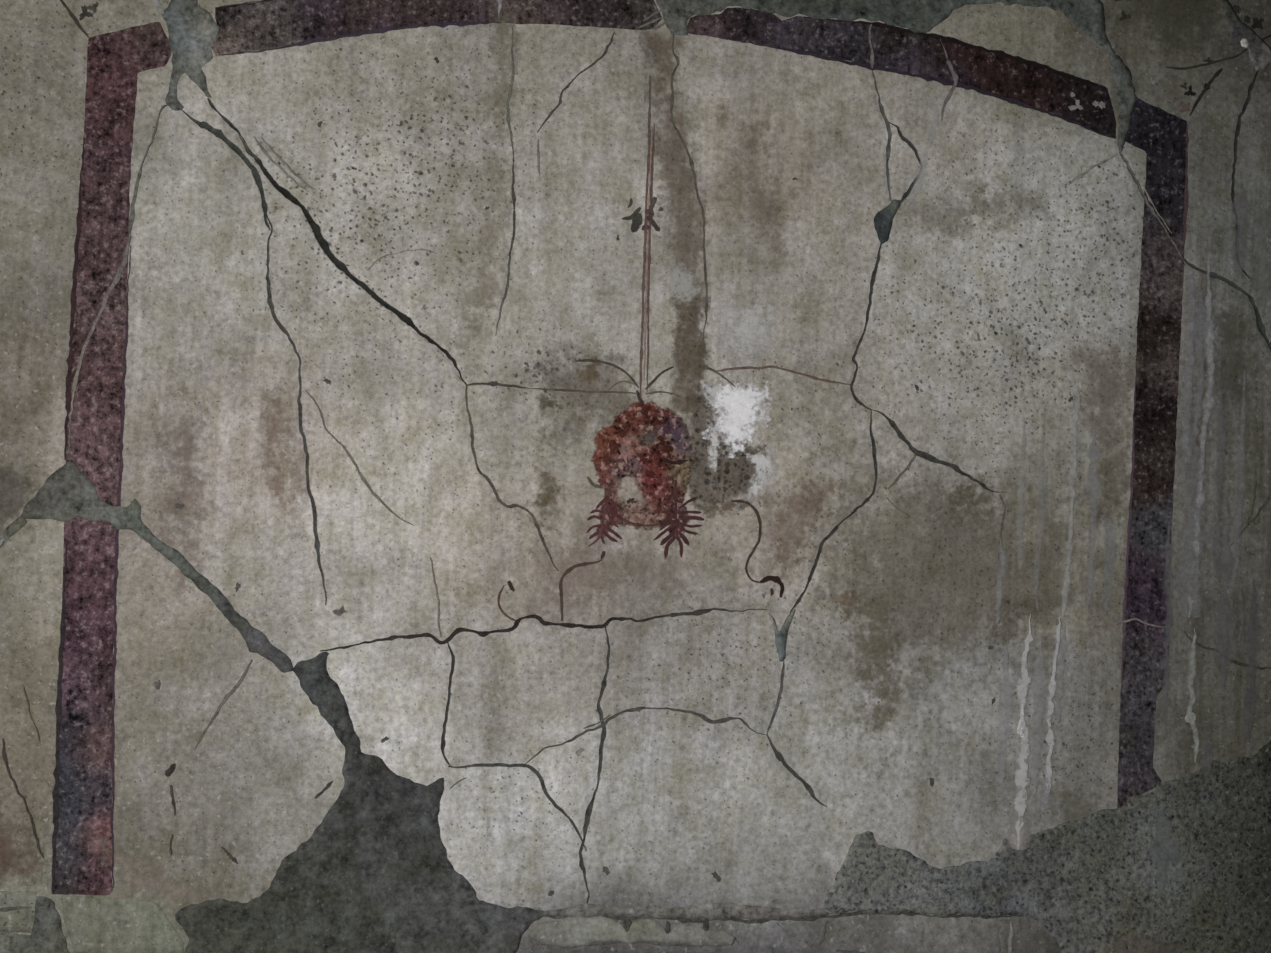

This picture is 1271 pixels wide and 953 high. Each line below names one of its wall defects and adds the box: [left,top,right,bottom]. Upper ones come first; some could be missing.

crack [67,98,557,605]
crack [495,30,615,336]
crack [670,36,708,342]
damp [646,35,778,513]
crack [868,24,922,210]
crack [940,39,959,121]
crack [1069,71,1271,351]
crack [165,659,252,855]
crack [315,781,332,799]
crack [320,241,1023,946]
damp [816,350,1132,850]
crack [1093,618,1271,670]